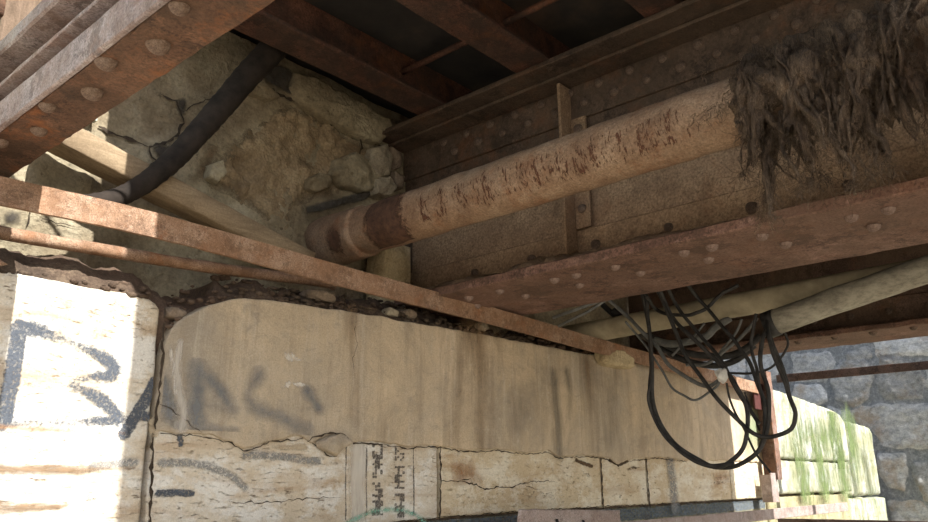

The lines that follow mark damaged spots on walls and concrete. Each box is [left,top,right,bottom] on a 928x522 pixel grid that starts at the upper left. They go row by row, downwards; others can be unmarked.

crack [98,94,211,160]
crack [233,496,340,504]
spalling [280,432,353,457]
crack [353,442,762,522]
damp [795,409,871,503]